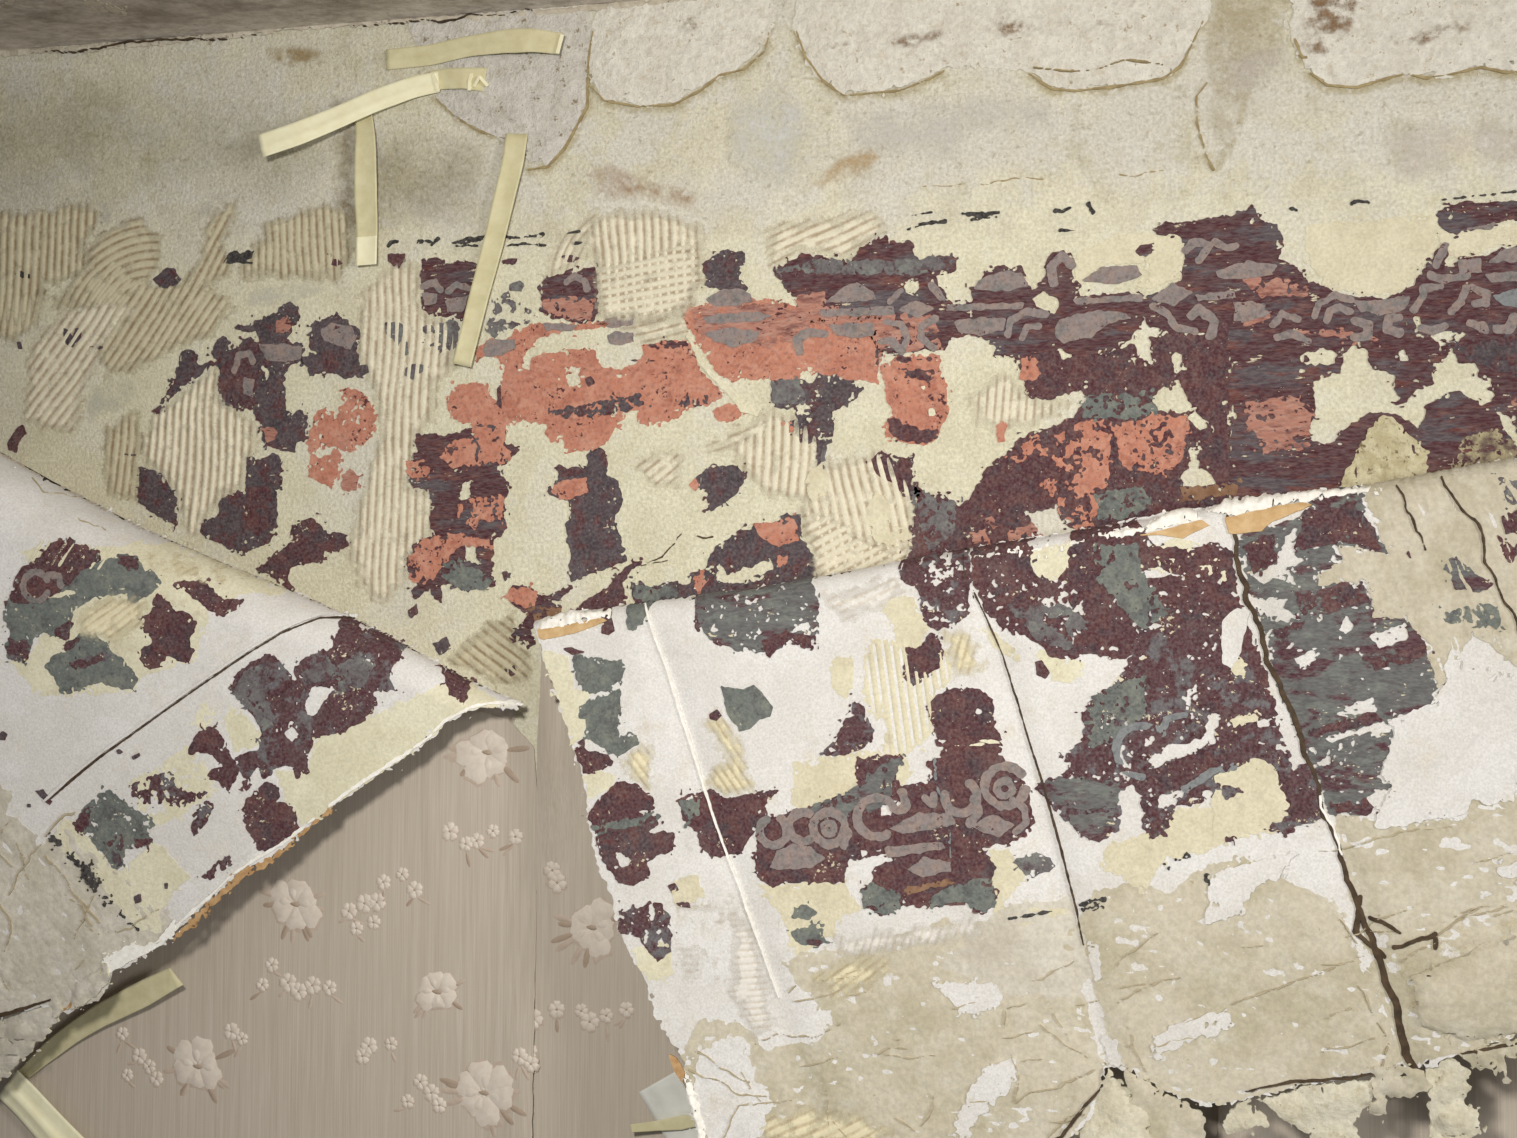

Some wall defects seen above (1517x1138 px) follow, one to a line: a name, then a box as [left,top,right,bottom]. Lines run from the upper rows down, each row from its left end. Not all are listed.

peeling [151,301,378,591]
peeling [136,467,182,531]
peeling [4,537,139,609]
crack [641,534,714,566]
peeling [905,636,943,675]
peeling [1308,712,1383,738]
crack [0,616,353,1017]
crack [954,514,1517,1138]
crack [645,603,860,1138]
peeling [860,878,997,915]
crack [877,1039,935,1059]
crack [895,1096,934,1131]